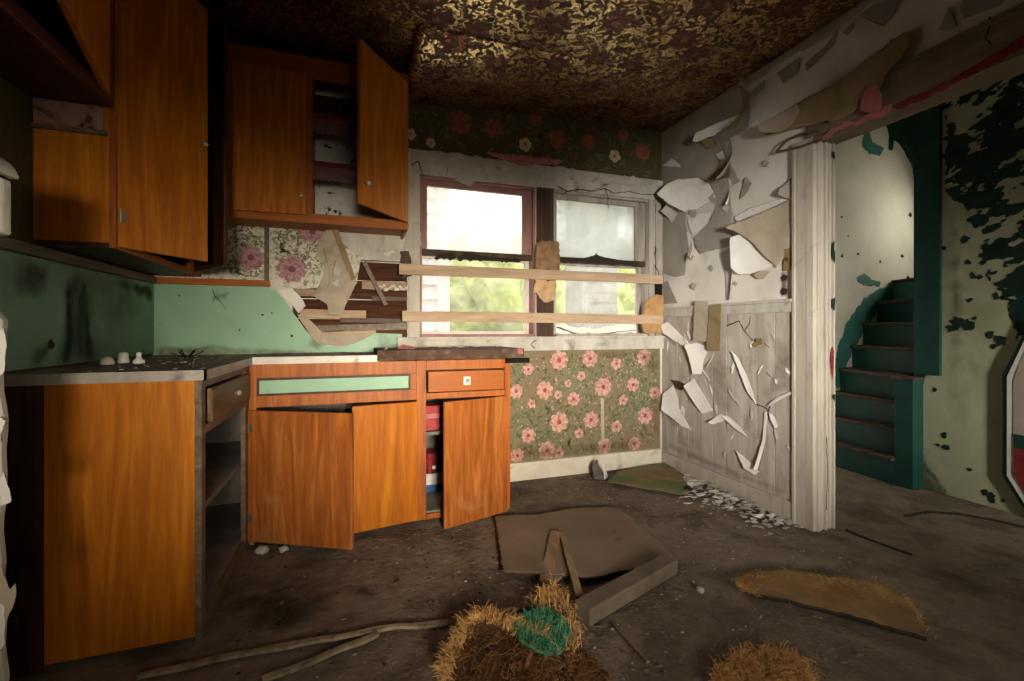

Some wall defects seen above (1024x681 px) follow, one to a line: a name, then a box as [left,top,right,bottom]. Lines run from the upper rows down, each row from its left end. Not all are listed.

flaking render [278,177,421,347]
crack [558,173,657,208]
peeling [410,0,898,260]
peeling [655,281,677,304]
peeling [661,235,791,475]
peeling [814,36,1024,350]
peeling [982,489,1005,503]